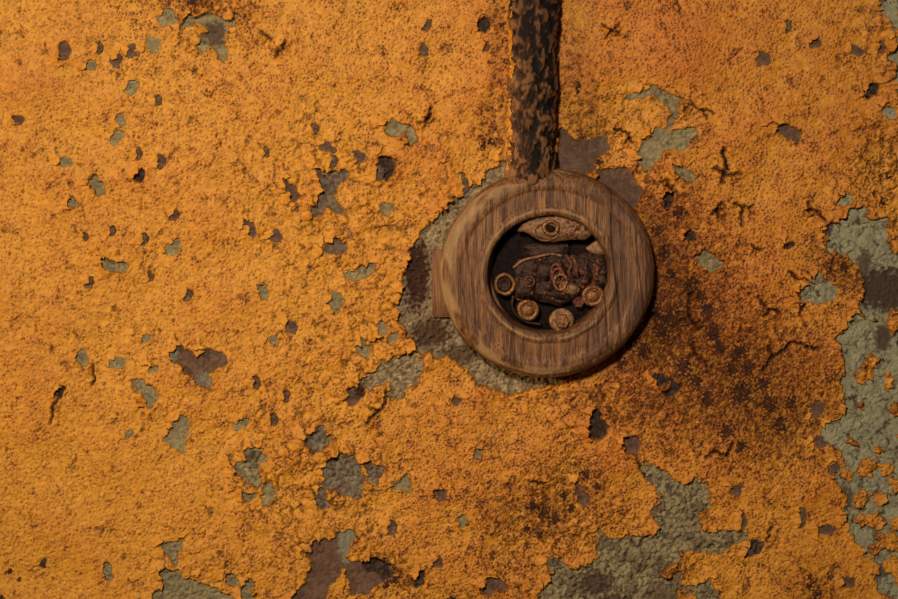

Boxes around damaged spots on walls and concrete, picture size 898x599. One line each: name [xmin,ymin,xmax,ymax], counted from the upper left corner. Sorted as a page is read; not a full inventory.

peeling [109,35,161,96]
peeling [157,1,240,62]
peeling [272,116,418,221]
peeling [554,80,697,209]
flaking render [334,145,569,406]
peeling [163,335,227,390]
peeling [796,188,898,599]
peeling [218,448,275,505]
peeling [289,422,412,511]
peeling [532,406,765,599]
peeling [122,523,256,599]
peeling [281,523,393,599]